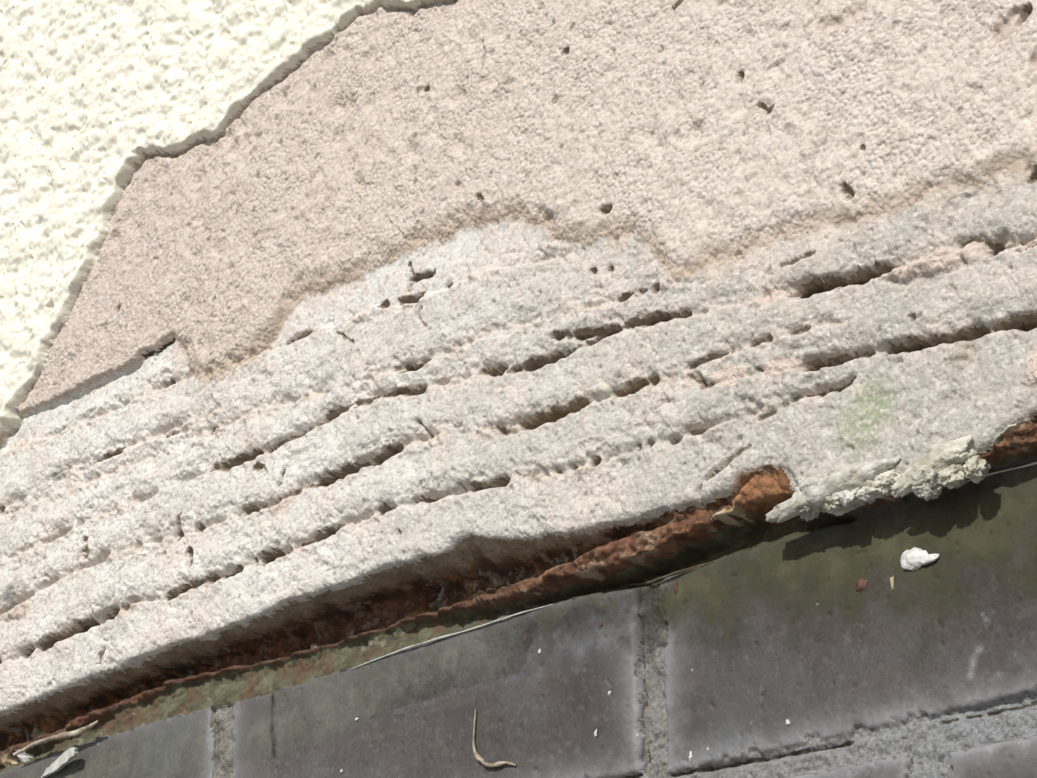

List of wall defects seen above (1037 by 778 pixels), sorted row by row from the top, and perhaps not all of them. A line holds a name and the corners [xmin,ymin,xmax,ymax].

peeling [354,0,437,12]
spalling [815,0,869,35]
spalling [984,4,1032,49]
spalling [1026,44,1037,76]
flaking render [0,169,1037,730]
rust [734,473,791,514]
rust [603,534,637,561]
leakage [648,435,1037,626]